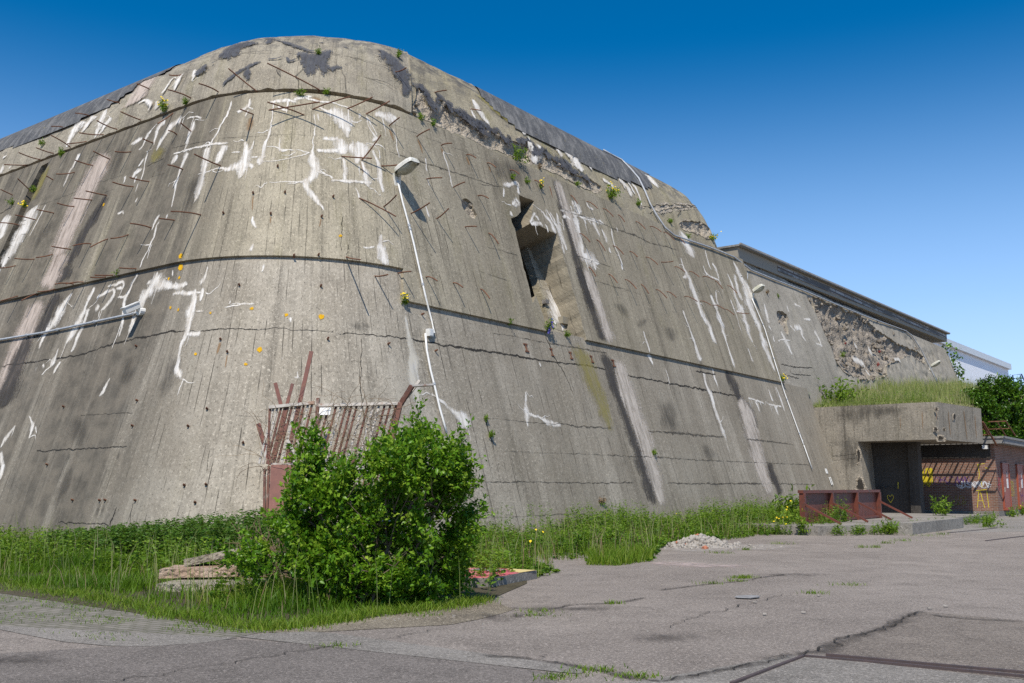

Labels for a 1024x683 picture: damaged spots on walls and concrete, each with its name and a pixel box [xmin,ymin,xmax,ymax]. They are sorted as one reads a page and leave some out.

water stain [121,62,214,110]
spalling [412,82,602,194]
water stain [0,95,399,407]
water stain [530,181,623,342]
spalling [640,202,711,241]
crack [3,327,733,396]
water stain [679,232,822,494]
spalling [808,298,923,387]
water stain [0,426,15,479]
water stain [602,355,665,505]
crack [483,611,941,681]